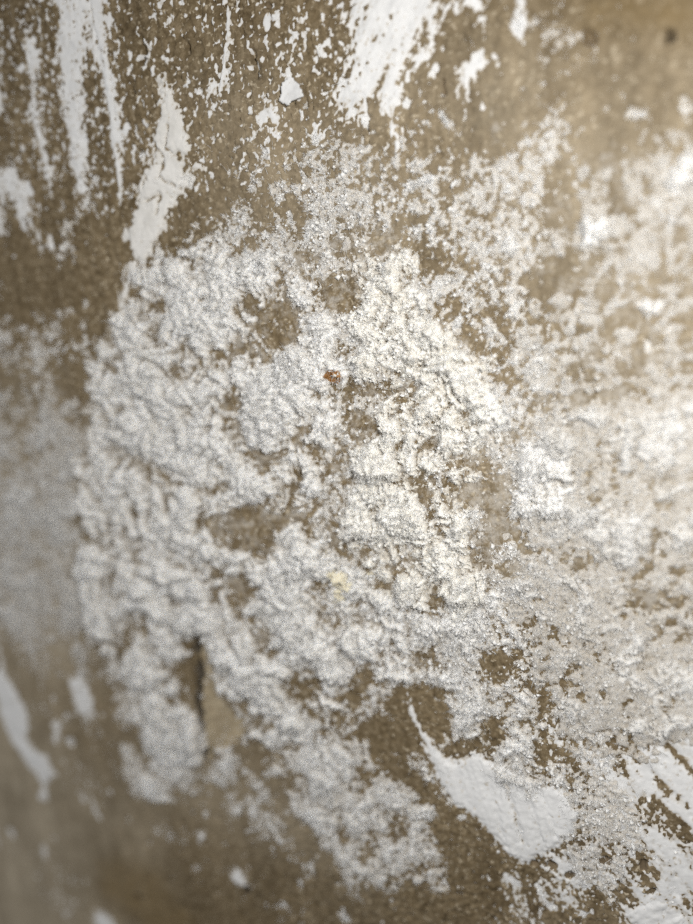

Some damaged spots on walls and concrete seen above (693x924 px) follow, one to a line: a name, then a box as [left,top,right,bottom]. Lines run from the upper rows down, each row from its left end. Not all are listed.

peeling [252,0,503,152]
peeling [505,0,528,45]
water stain [508,0,607,98]
spalling [581,27,599,49]
spalling [666,28,677,43]
water stain [417,86,466,137]
water stain [625,107,651,144]
peeling [0,0,244,334]
water stain [42,193,109,269]
water stain [407,752,453,807]
peeling [531,718,693,924]
water stain [506,875,556,924]